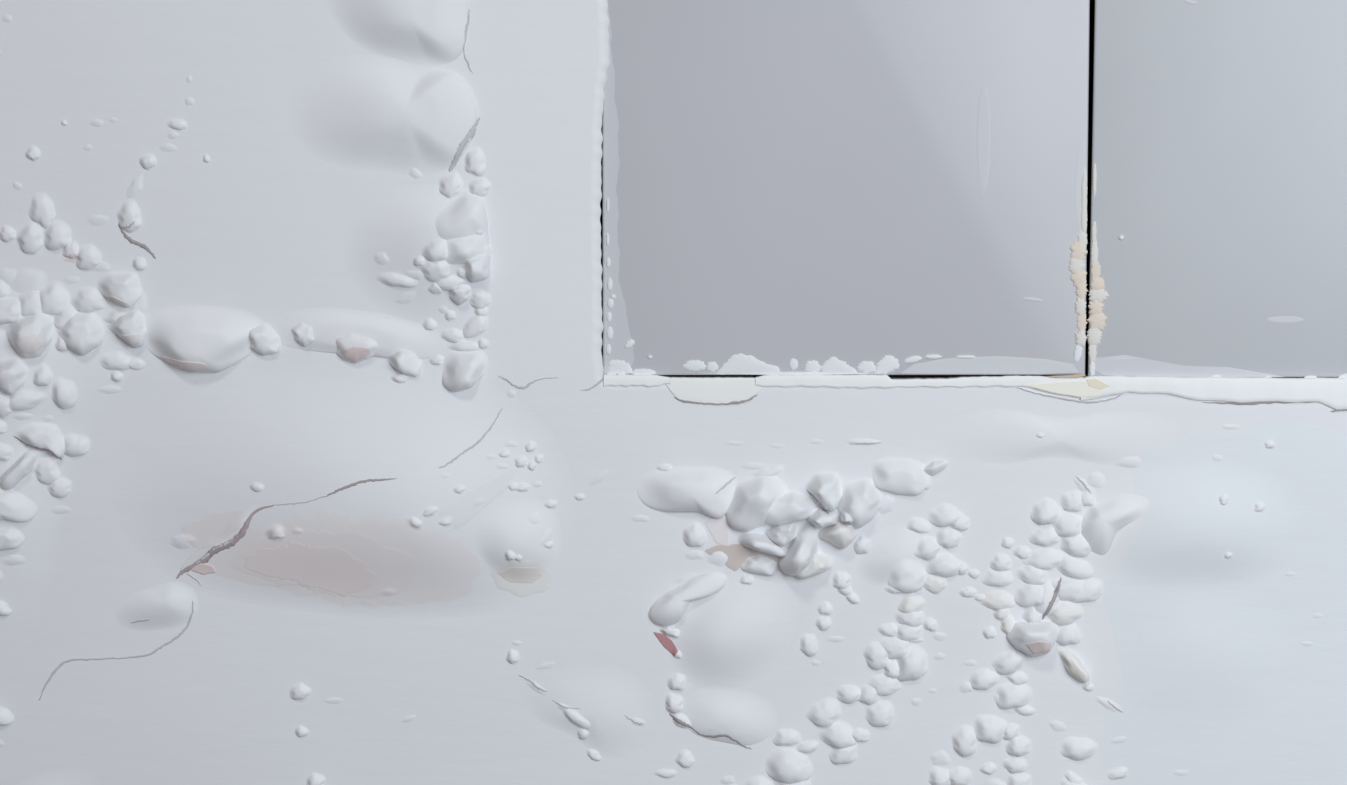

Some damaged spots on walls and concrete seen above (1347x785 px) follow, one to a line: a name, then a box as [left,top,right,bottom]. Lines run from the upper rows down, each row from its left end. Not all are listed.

crack [439,375,604,468]
crack [39,478,397,700]
water stain [181,468,553,609]